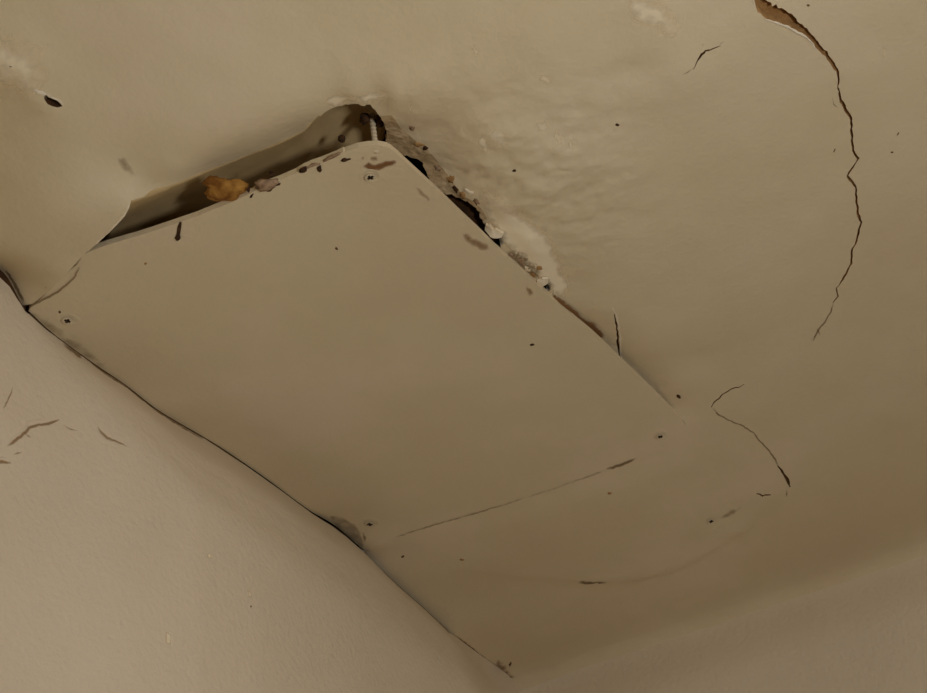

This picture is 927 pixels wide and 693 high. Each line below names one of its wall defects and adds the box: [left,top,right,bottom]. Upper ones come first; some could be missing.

spalling [380,115,504,239]
peeling [451,87,627,178]
crack [752,0,862,338]
spalling [509,253,556,297]
crack [0,262,243,464]
crack [711,384,790,497]